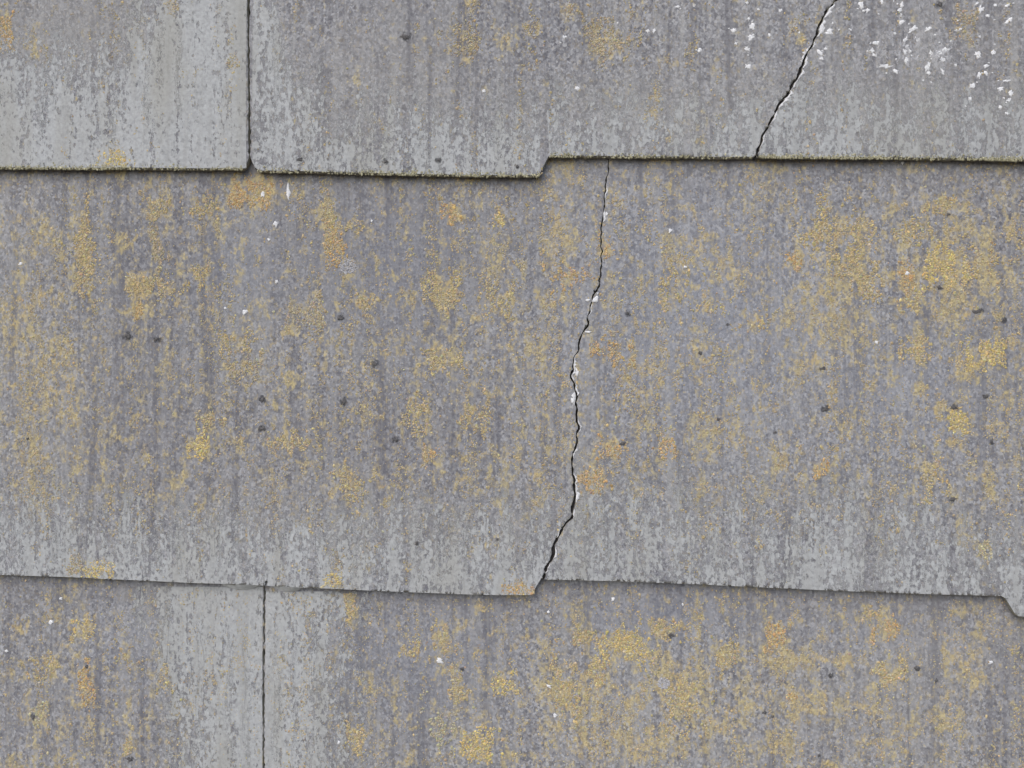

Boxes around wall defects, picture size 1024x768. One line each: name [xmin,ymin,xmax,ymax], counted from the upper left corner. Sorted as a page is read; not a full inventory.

crack [753,0,838,159]
crack [543,161,609,579]